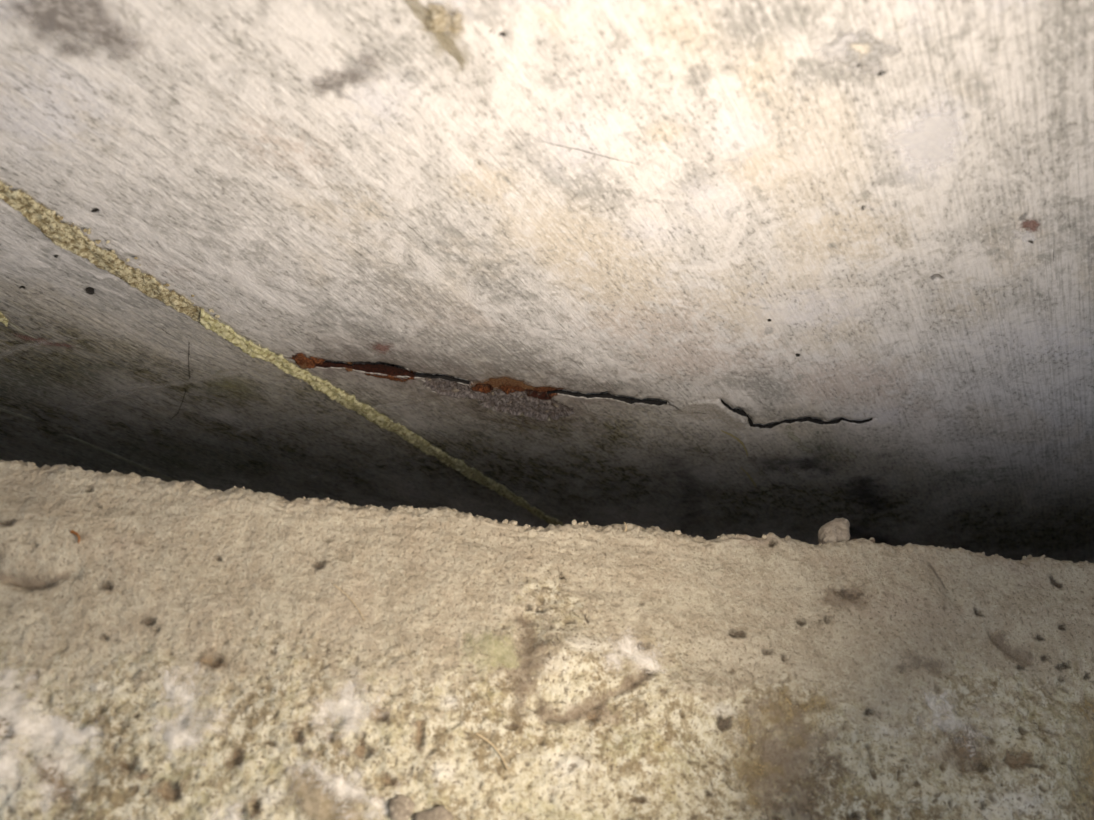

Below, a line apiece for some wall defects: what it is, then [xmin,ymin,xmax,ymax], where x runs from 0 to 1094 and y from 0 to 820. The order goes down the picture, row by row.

rust [290,353,326,369]
crack [316,362,470,384]
rust [470,377,563,400]
crack [547,390,872,428]